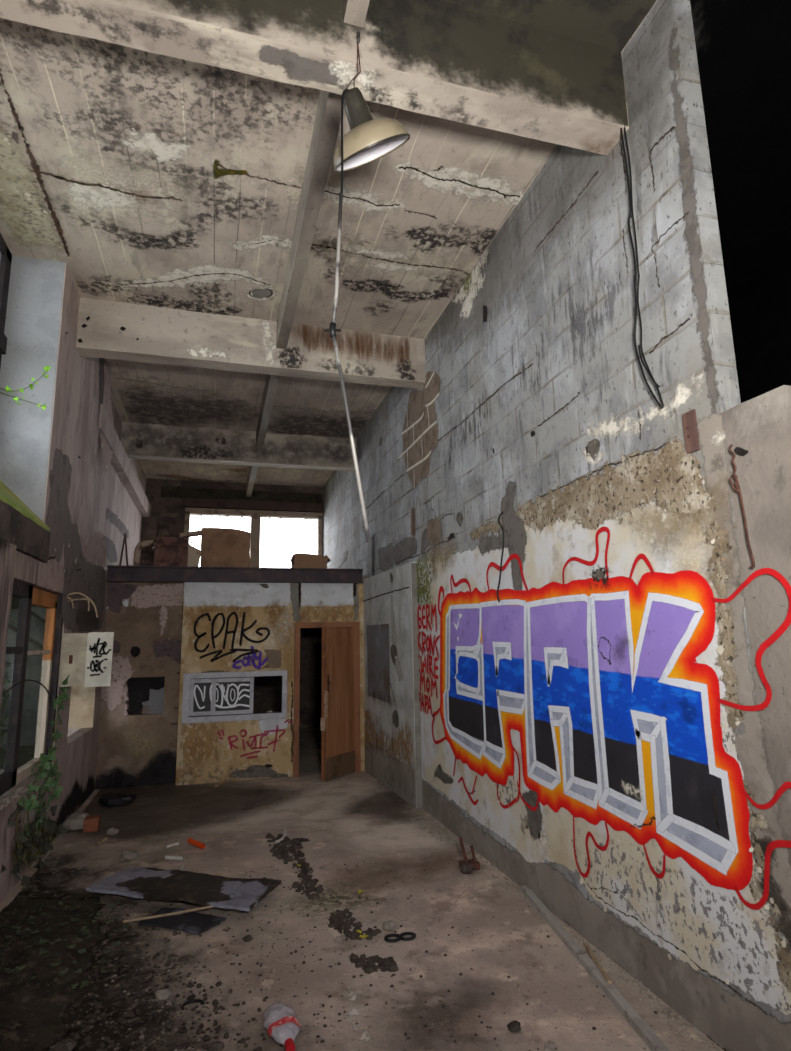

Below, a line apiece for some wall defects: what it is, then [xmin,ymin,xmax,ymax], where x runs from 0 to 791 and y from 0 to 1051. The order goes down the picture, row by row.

crack [0,70,182,256]
water stain [0,20,310,250]
crack [213,158,524,219]
water stain [78,275,241,315]
water stain [326,225,497,318]
crack [651,212,689,288]
crack [649,318,690,354]
water stain [122,388,366,482]
peeling [427,512,503,546]
peeling [106,582,139,614]
flaking render [516,438,746,748]
flaking render [153,638,182,664]